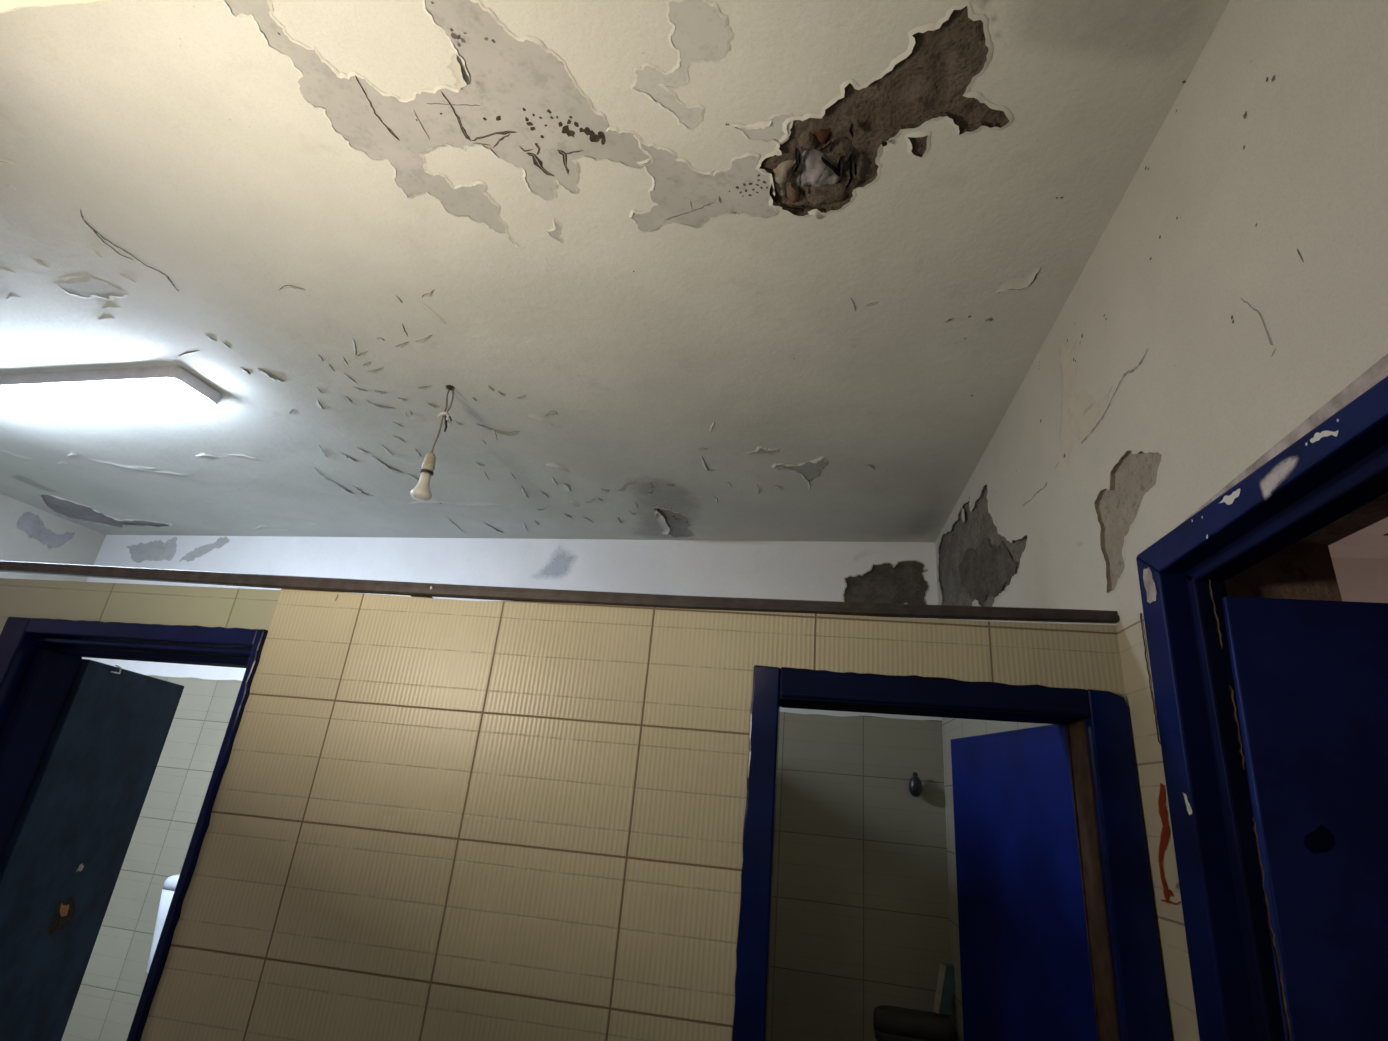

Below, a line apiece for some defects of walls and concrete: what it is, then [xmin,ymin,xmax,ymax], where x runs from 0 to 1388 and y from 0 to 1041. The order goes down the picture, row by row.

peeling [222,0,1014,247]
crack [80,209,179,292]
peeling [319,290,446,482]
peeling [56,451,183,475]
peeling [15,493,230,563]
peeling [523,462,694,538]
spalling [842,482,1030,620]
spalling [1094,449,1163,595]
peeling [1143,567,1157,603]
peeling [1220,489,1240,505]
peeling [1261,419,1339,497]
rust [1158,783,1181,905]